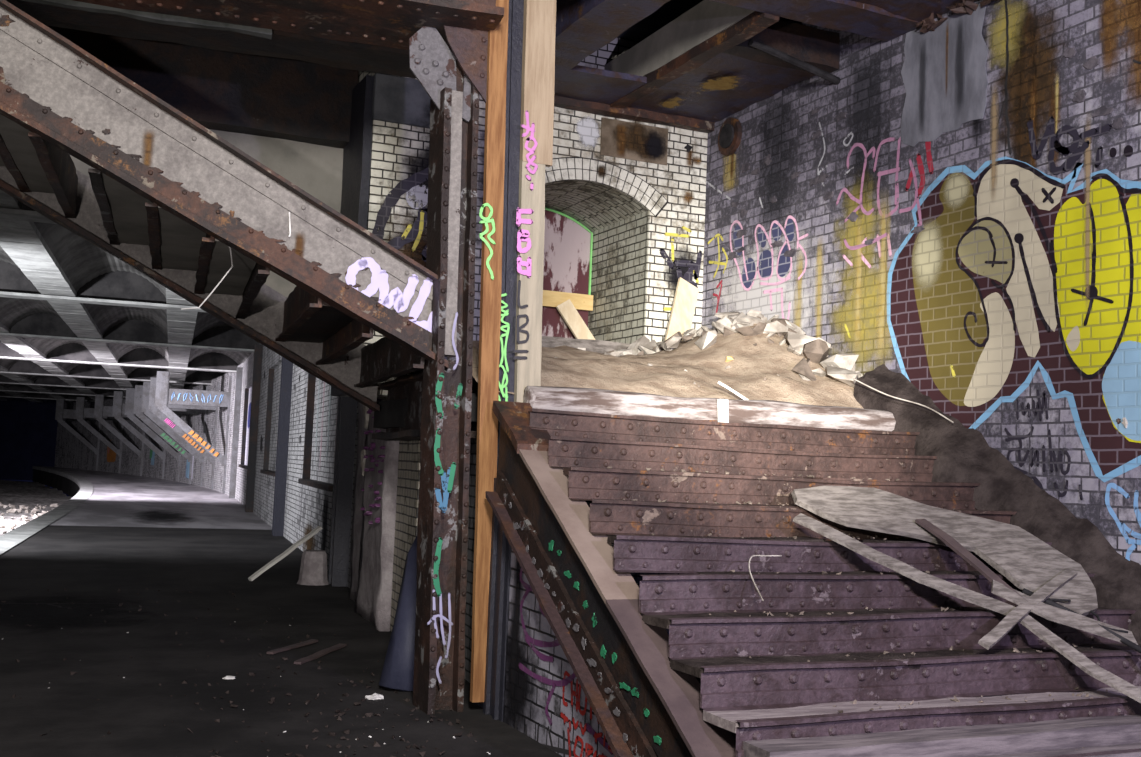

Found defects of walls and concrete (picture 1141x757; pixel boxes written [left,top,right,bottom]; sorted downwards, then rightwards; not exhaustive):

peeling [0,15,15,27]
corrosion [1102,0,1141,98]
corrosion [135,133,153,167]
peeling [112,145,201,196]
leakage [576,117,668,165]
leakage [764,108,788,217]
leakage [816,69,892,372]
corrosion [282,235,304,258]